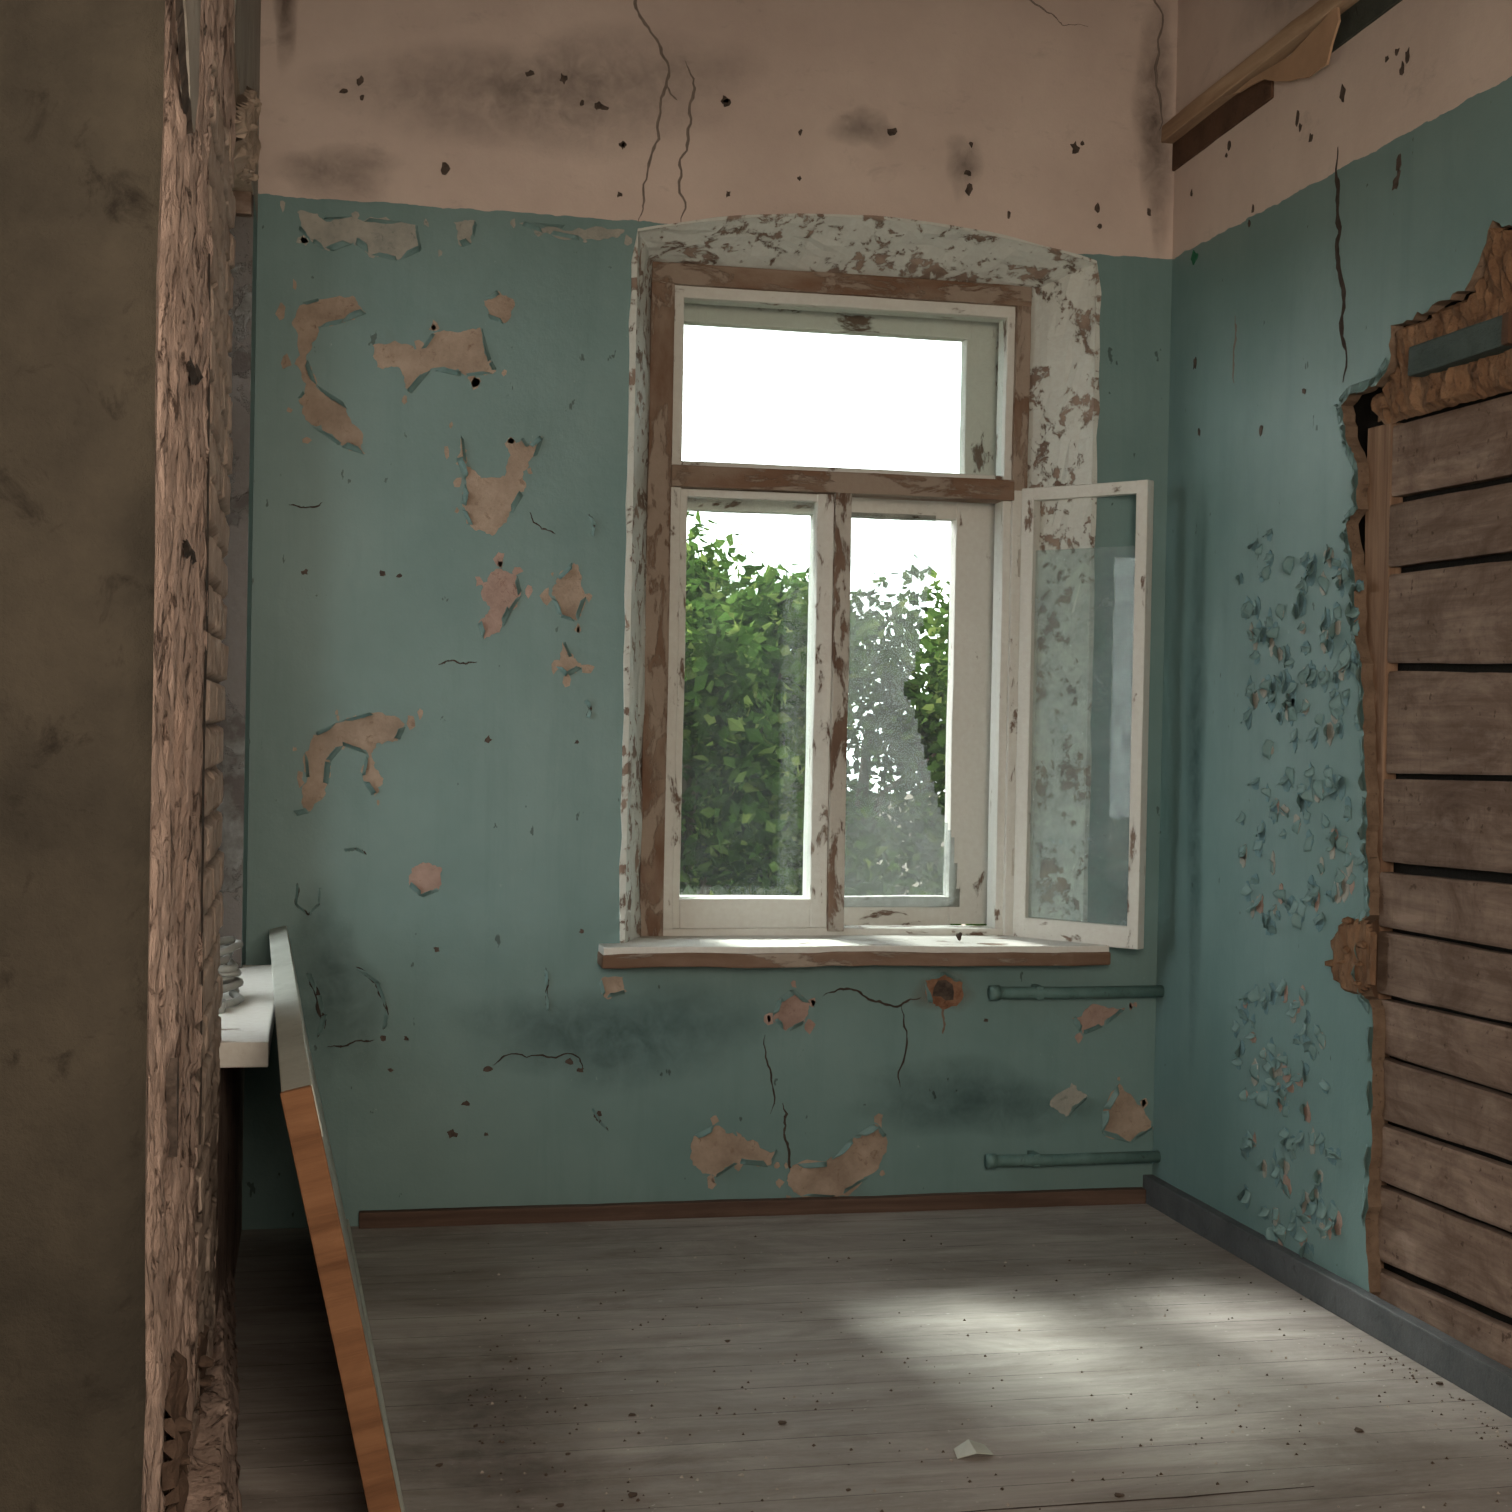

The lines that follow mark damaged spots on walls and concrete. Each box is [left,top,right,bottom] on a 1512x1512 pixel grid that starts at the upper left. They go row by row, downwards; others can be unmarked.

crack [1030,0,1088,27]
crack [633,0,696,222]
peeling [275,279,366,455]
peeling [373,290,515,404]
crack [1335,147,1347,382]
peeling [444,421,594,687]
flaking render [1234,227,1512,1062]
peeling [293,709,423,816]
crack [763,1037,791,1169]
peeling [690,1113,888,1198]
crack [823,987,921,1083]
peeling [1231,978,1343,1261]